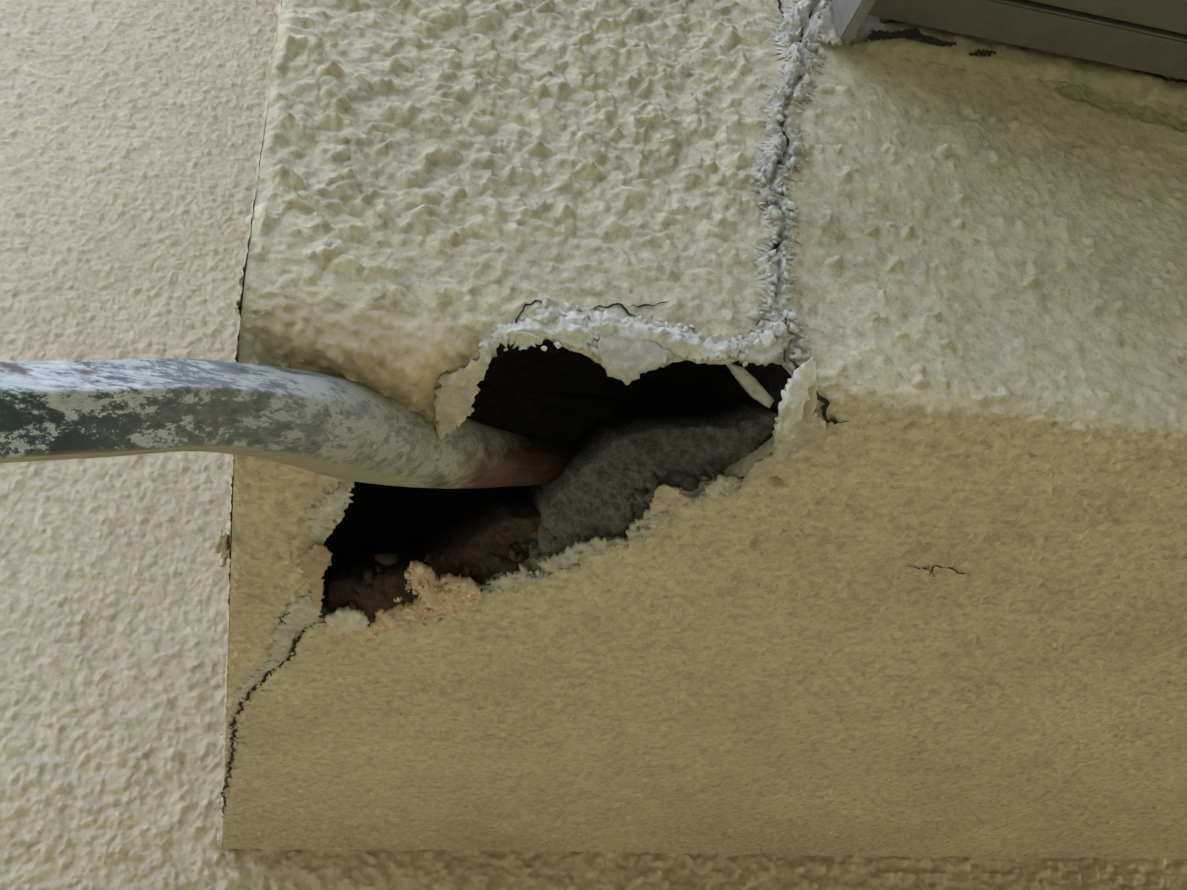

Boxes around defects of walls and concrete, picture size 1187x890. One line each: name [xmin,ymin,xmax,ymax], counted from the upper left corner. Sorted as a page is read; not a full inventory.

crack [747,0,829,375]
peeling [215,529,229,568]
spalling [236,299,826,698]
crack [816,391,849,425]
crack [214,612,327,821]